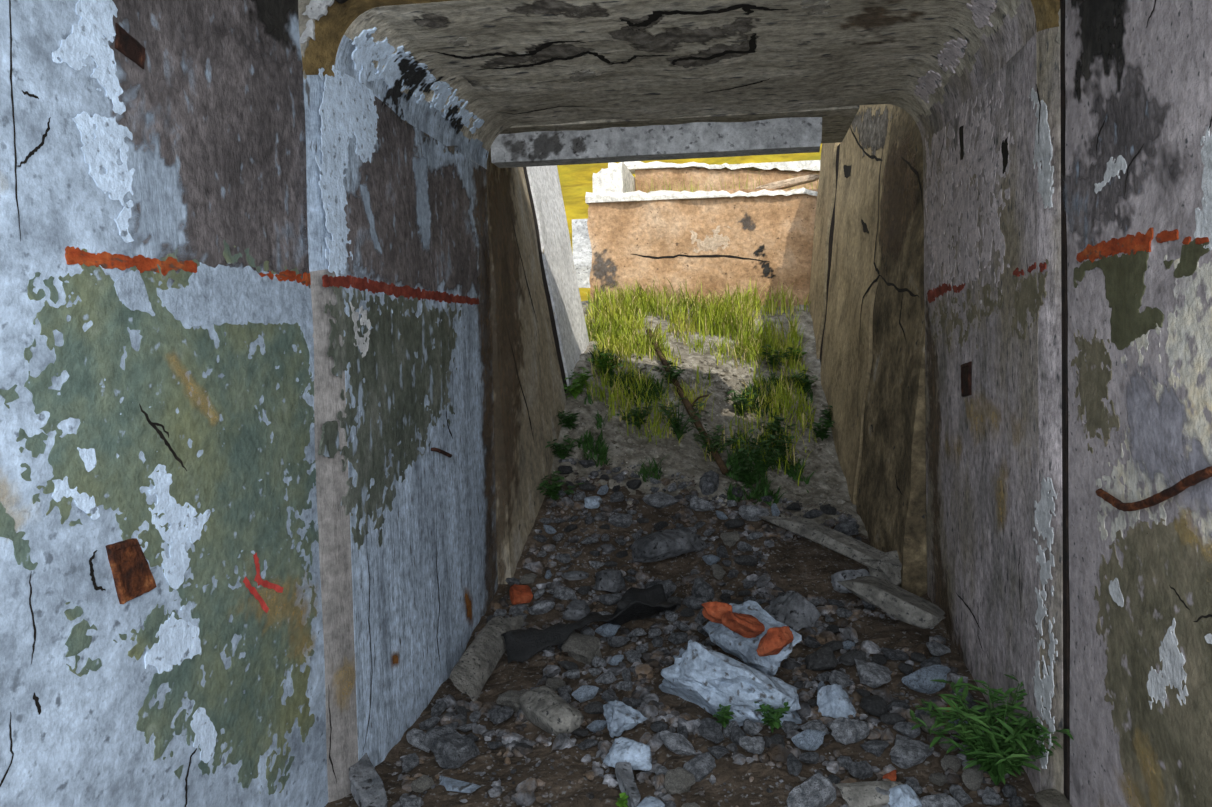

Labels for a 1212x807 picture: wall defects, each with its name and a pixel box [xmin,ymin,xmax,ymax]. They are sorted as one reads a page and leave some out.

crack [9,0,51,241]
crack [428,4,788,93]
damp [1099,0,1124,92]
crack [139,403,187,471]
peeling [0,0,484,795]
peeling [1071,126,1212,807]